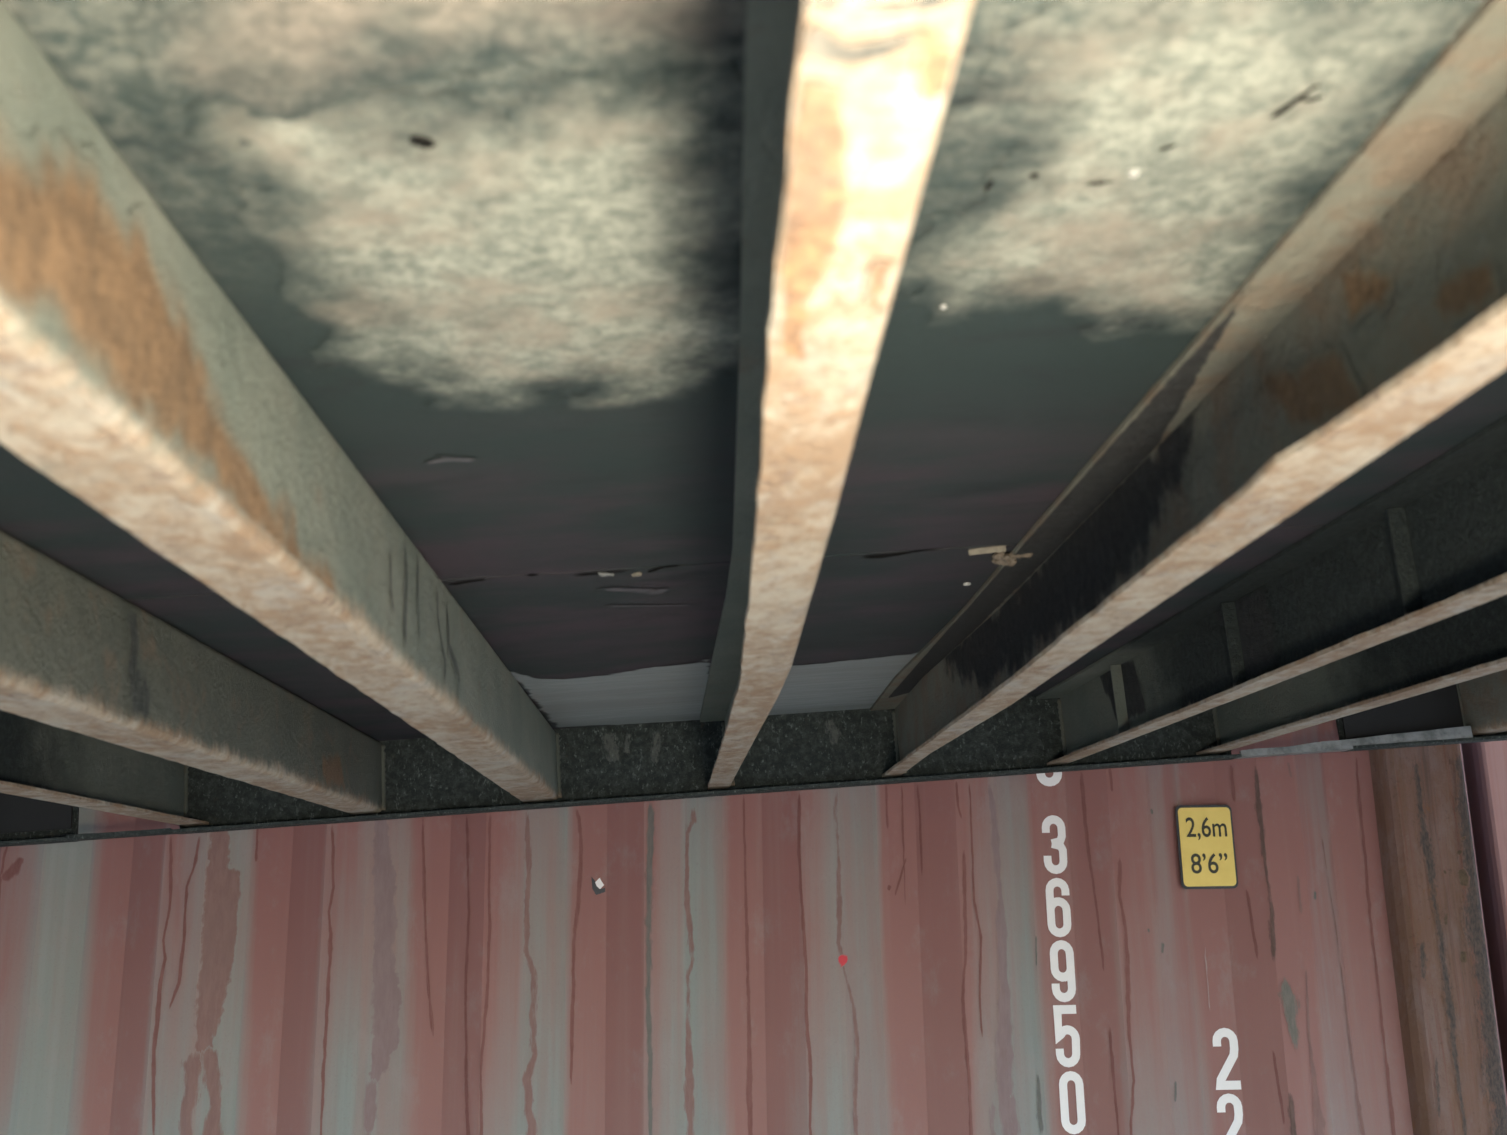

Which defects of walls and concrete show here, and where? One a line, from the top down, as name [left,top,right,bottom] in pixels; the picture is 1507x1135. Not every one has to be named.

rust [912,30,957,103]
rust [0,105,338,595]
water stain [115,0,747,415]
rust [774,79,853,362]
rust [860,259,897,314]
water stain [892,0,1466,343]
rust [1257,258,1396,438]
rust [1429,252,1502,326]
crack [576,565,680,576]
crack [864,549,938,559]